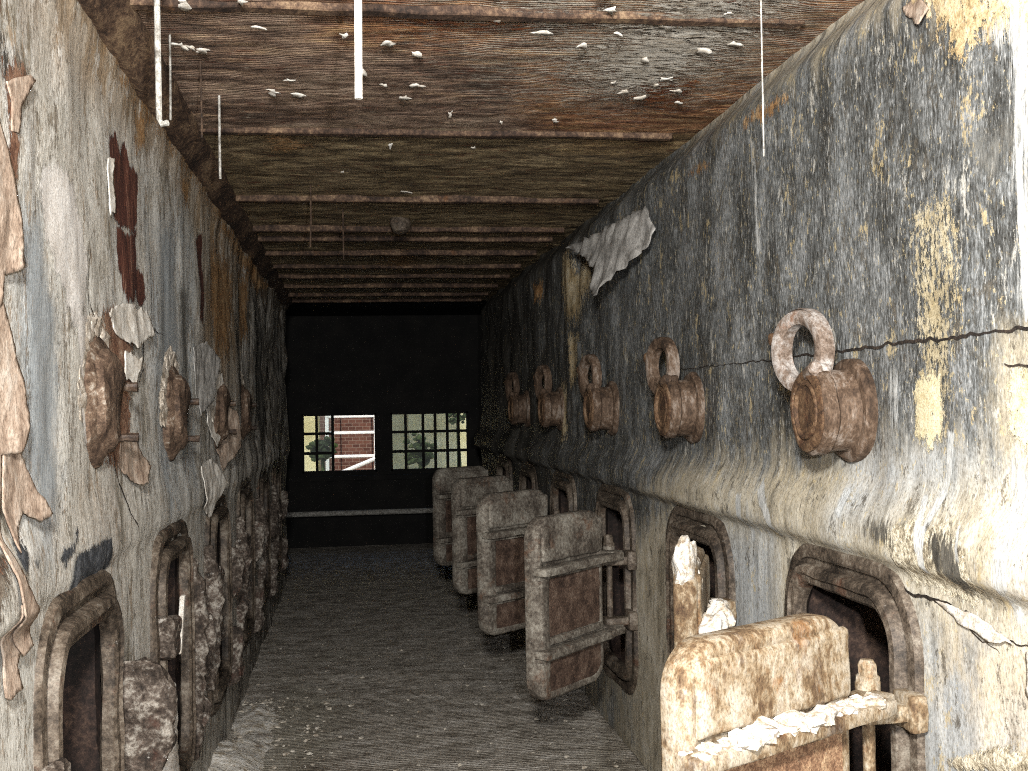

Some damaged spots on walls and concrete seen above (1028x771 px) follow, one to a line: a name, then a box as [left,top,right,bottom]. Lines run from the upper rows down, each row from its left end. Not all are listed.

water stain [973,0,1028,322]
peeling [0,29,53,700]
peeling [561,205,657,442]
crack [681,325,1028,370]
water stain [889,368,898,432]
peeling [60,527,113,592]
water stain [913,431,954,574]
crack [904,587,1028,652]
water stain [991,463,1028,628]